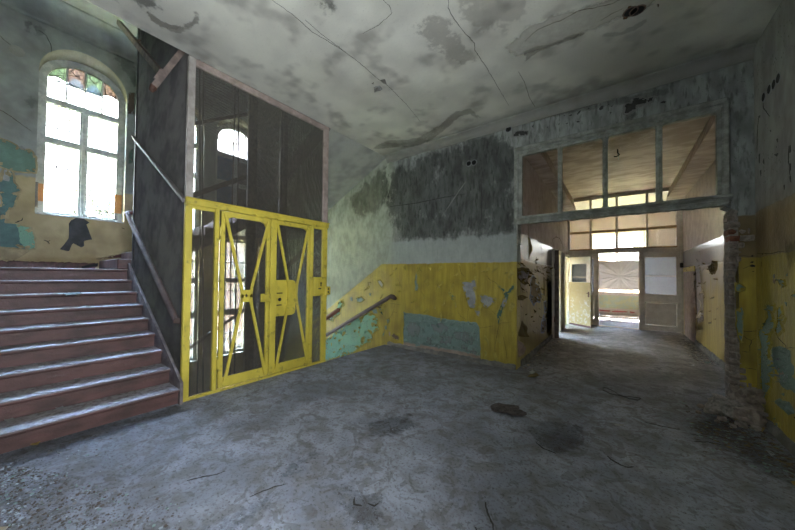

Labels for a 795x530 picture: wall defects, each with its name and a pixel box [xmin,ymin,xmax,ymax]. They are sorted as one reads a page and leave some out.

crack [275,2,420,121]
crack [448,0,508,104]
peeling [0,138,38,261]
spalling [684,209,795,415]